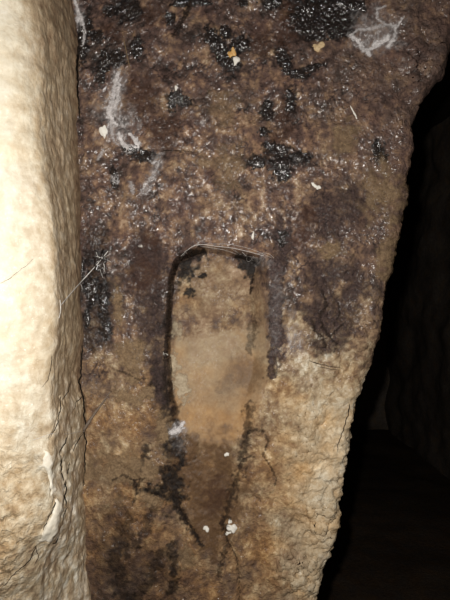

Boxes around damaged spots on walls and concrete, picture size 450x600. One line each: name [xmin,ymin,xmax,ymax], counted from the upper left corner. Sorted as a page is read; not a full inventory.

leakage [104,71,141,153]
leakage [266,216,293,379]
leakage [296,261,373,354]
crack [43,346,87,530]
leakage [126,233,247,564]
crack [0,546,39,590]
leakage [159,541,178,595]